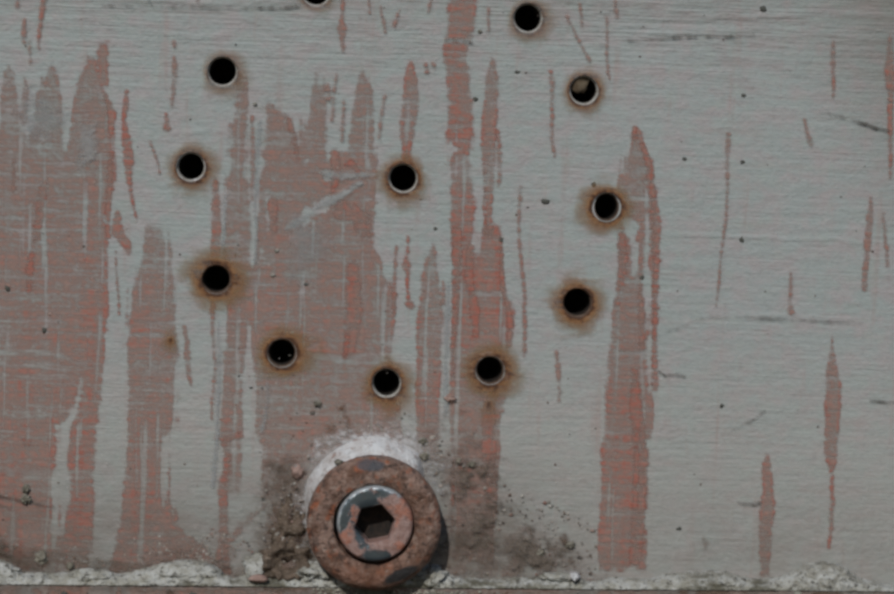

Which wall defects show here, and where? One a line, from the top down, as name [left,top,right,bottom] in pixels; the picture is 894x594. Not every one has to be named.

peeling [21,0,45,62]
rust [581,186,629,230]
peeling [0,44,137,570]
rust [187,252,244,303]
peeling [109,0,527,575]
rust [553,279,601,328]
rust [467,346,517,407]
peeling [598,126,661,572]
peeling [33,585,81,594]